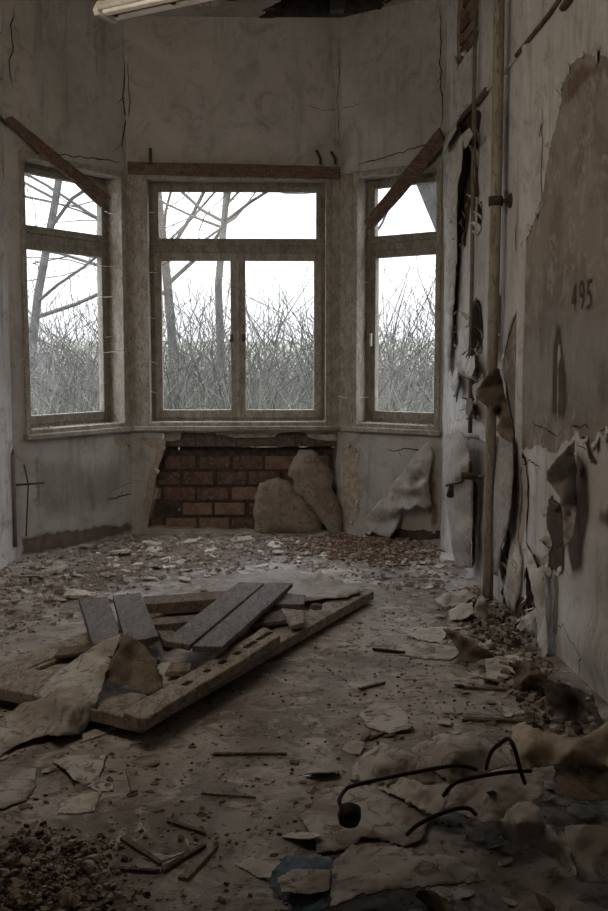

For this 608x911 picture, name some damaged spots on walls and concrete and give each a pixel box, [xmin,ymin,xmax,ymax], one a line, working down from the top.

flaking render [452,0,479,71]
peeling [498,47,608,464]
flaking render [147,432,365,544]
peeling [499,495,564,622]